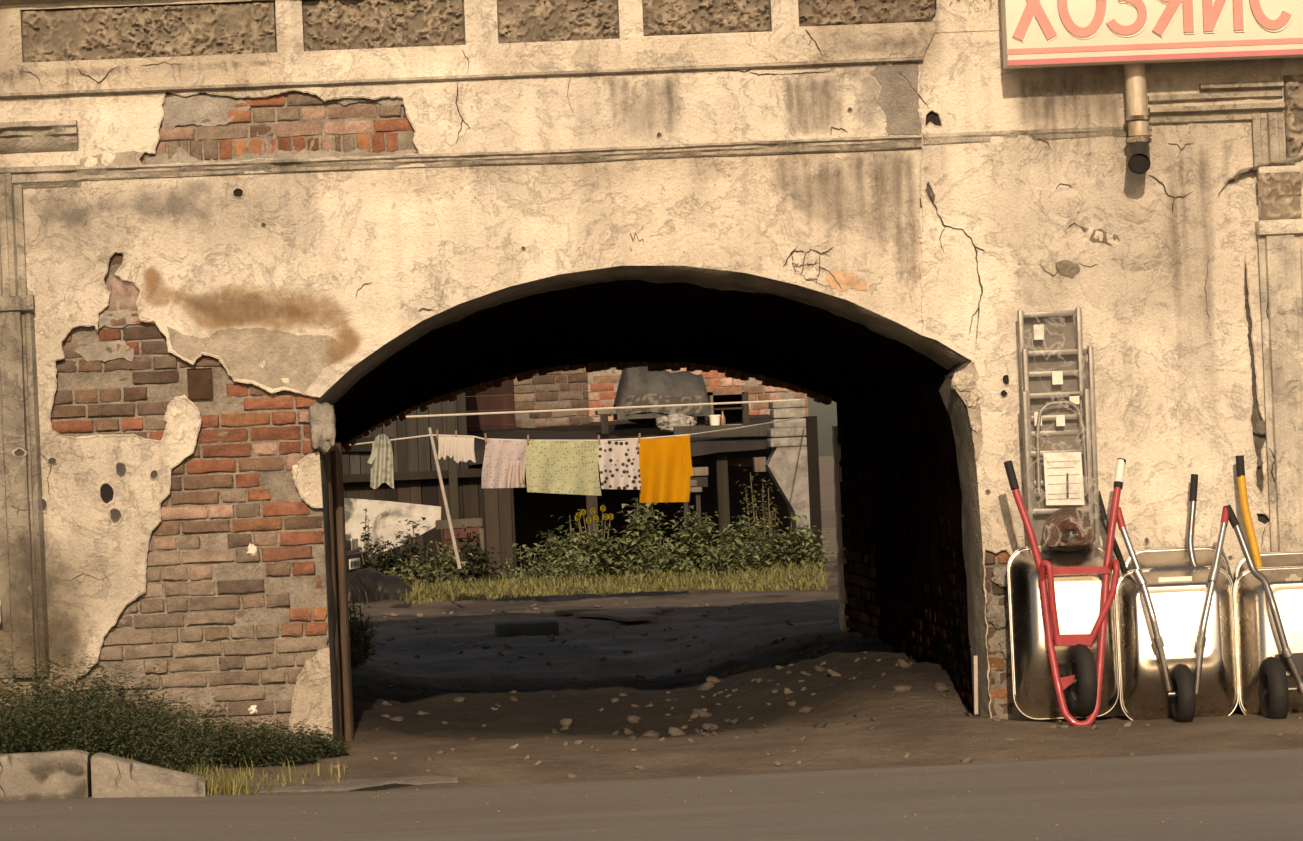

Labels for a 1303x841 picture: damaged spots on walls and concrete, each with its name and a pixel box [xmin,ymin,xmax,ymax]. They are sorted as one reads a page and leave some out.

spalling [80,88,421,167]
crack [455,50,470,143]
crack [1151,176,1192,211]
crack [785,247,841,287]
crack [926,183,984,339]
flaking render [1067,223,1120,248]
spalling [48,250,346,751]